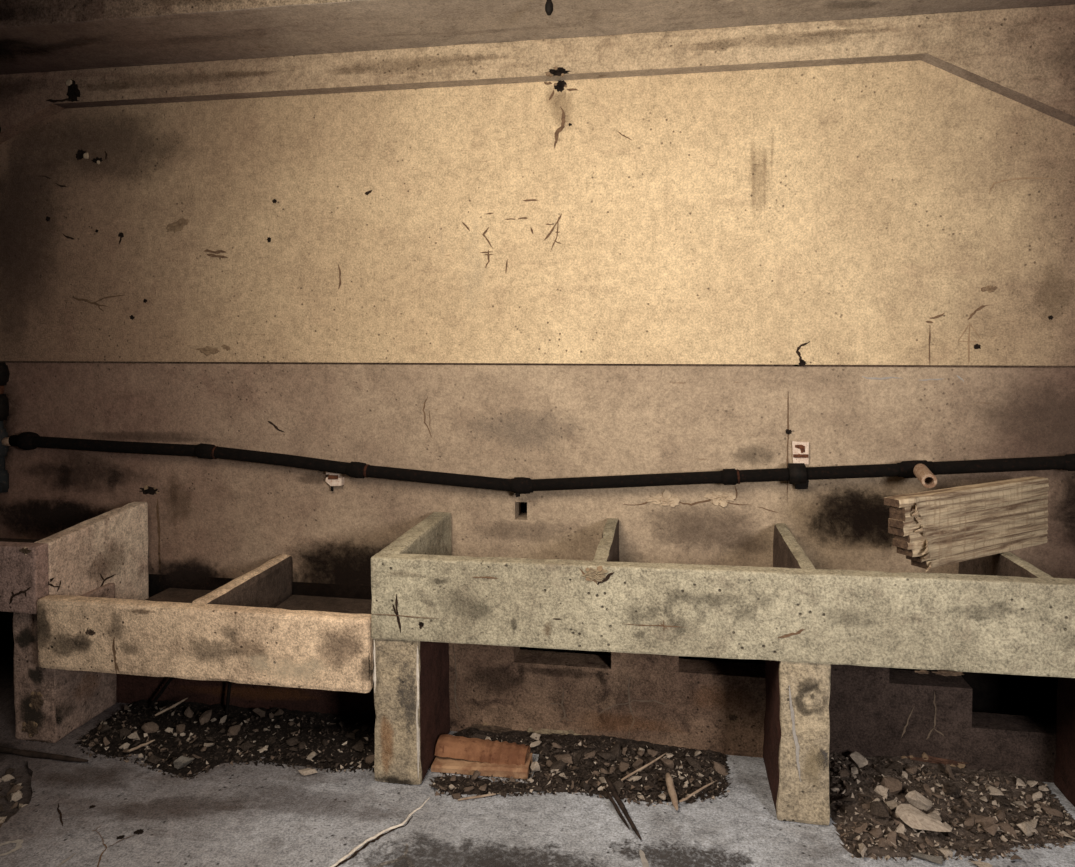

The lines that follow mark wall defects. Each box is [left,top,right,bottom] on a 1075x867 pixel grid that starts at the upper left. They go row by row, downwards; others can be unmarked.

crack [93,826,133,867]
crack [330,797,430,867]
leakage [365,833,603,867]
leakage [610,839,753,867]